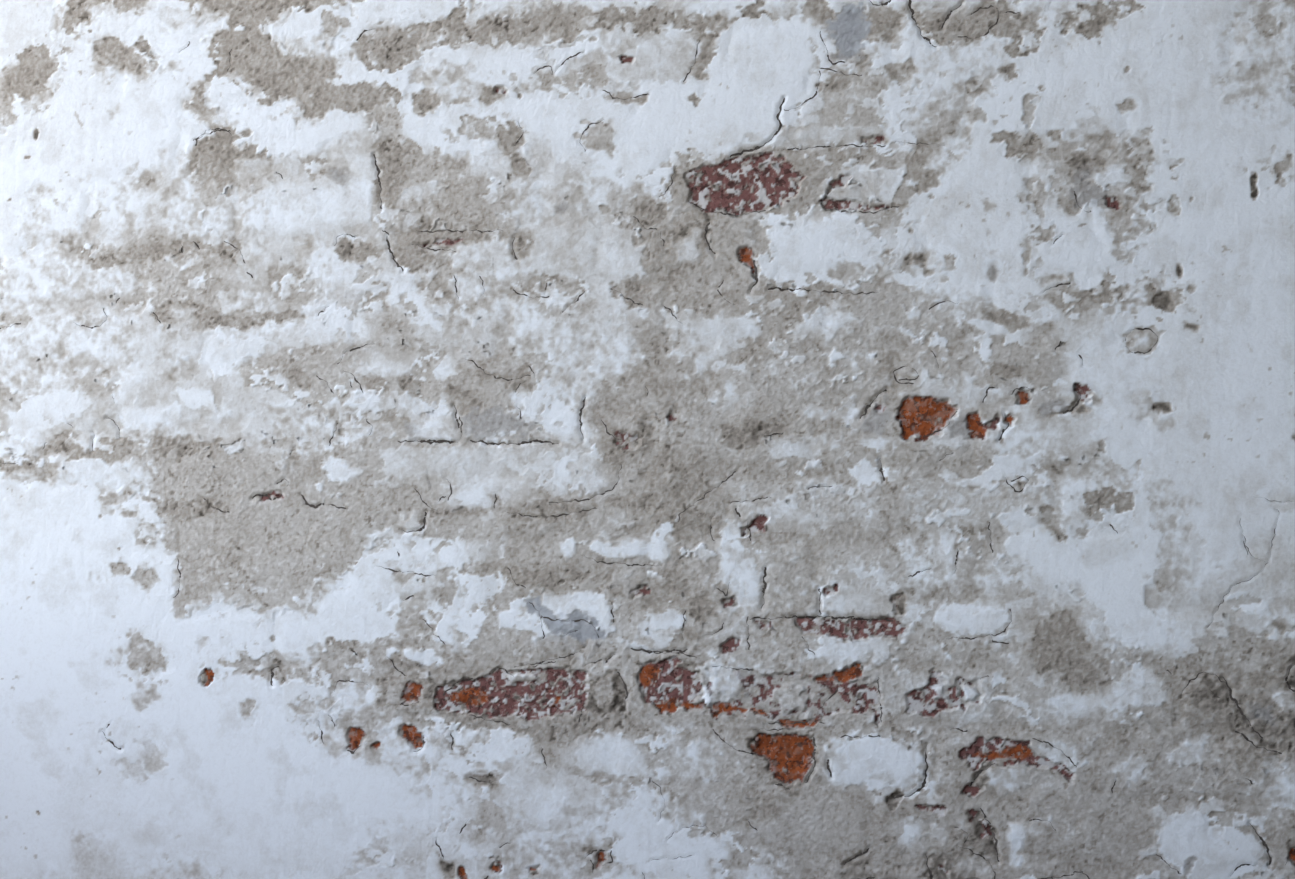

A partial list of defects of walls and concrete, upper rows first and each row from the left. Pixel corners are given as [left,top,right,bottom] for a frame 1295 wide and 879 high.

peeling [0,0,654,516]
peeling [350,0,738,116]
peeling [743,0,1048,195]
peeling [983,94,1186,282]
peeling [1055,0,1145,40]
peeling [88,557,161,594]
flaking render [105,128,1295,879]